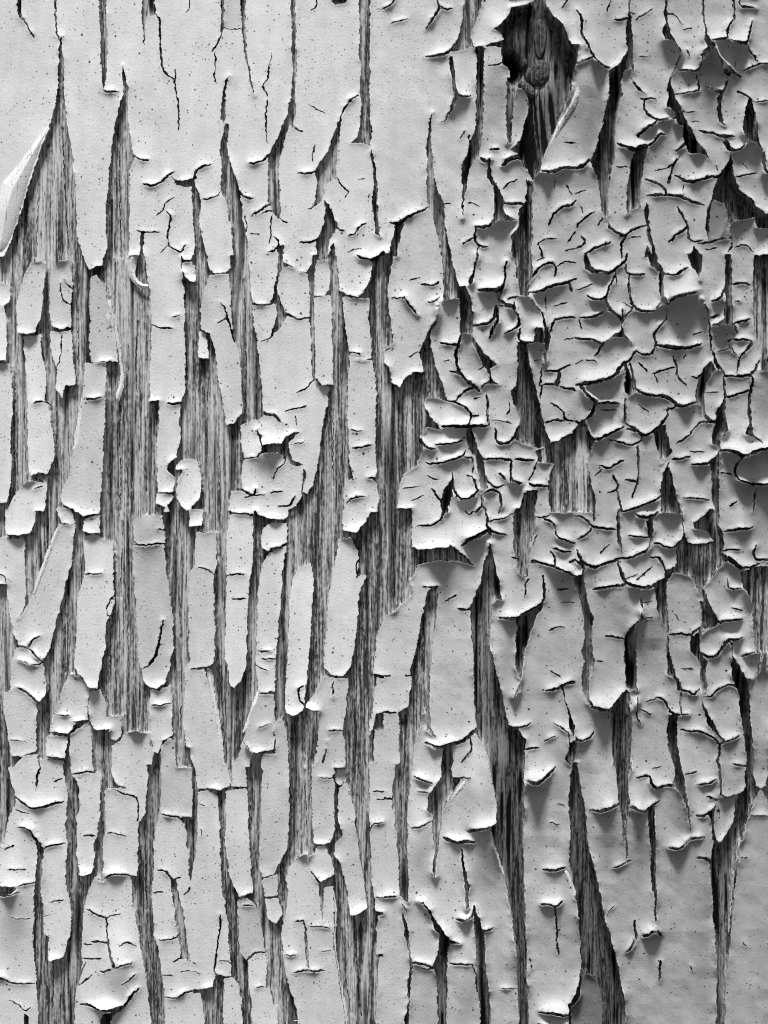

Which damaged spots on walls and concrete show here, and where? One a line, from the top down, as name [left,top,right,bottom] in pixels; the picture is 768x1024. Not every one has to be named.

crack [79,909,232,1012]
crack [159,19,180,130]
peeling [0,261,367,1024]
peeling [0,0,768,533]
peeling [368,204,768,1024]
crack [391,132,768,778]